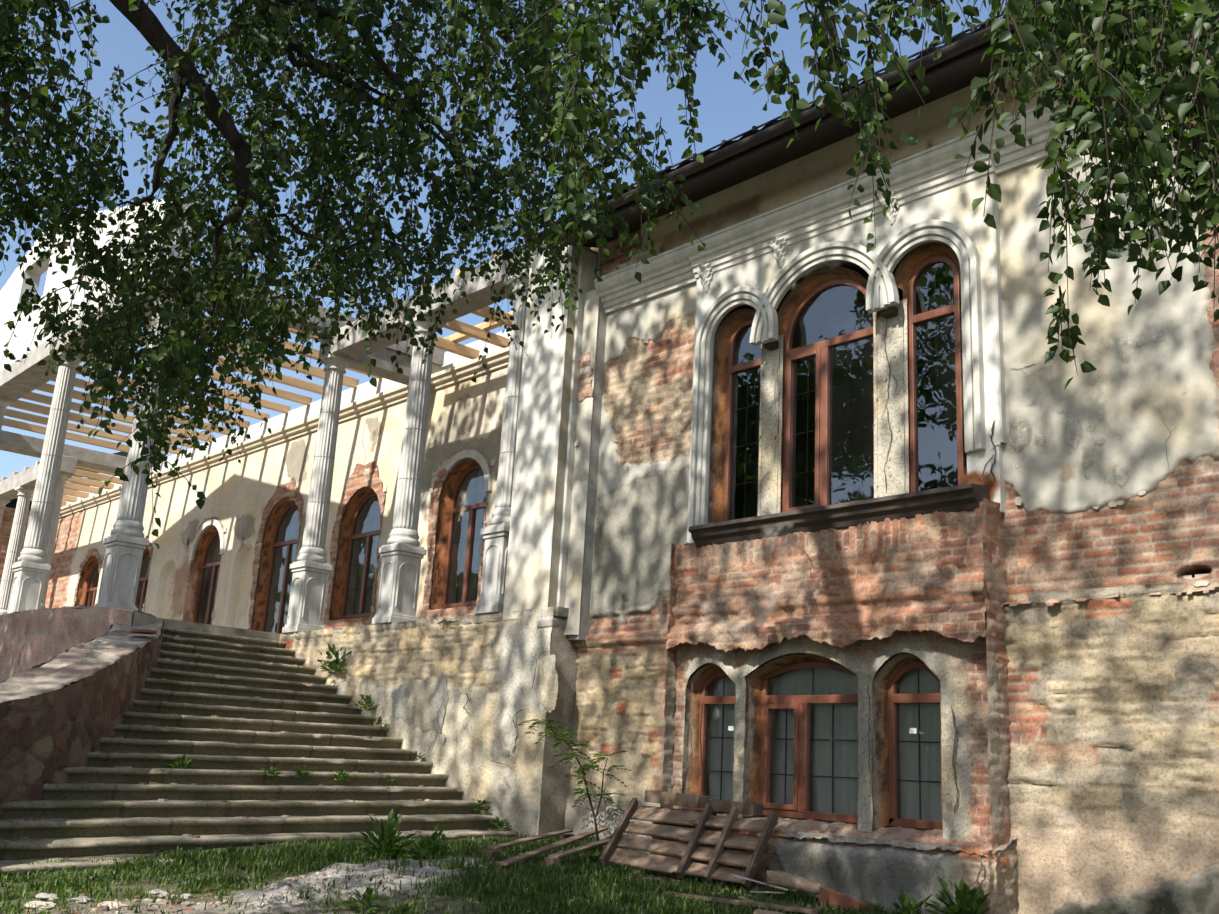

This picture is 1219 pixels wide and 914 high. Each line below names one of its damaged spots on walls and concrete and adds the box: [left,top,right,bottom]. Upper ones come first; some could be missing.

flaking render [598,229,643,277]
flaking render [1201,224,1219,389]
flaking render [577,312,695,466]
flaking render [498,707,517,757]
flaking render [537,654,558,712]
flaking render [565,455,1219,914]
crack [950,704,962,813]